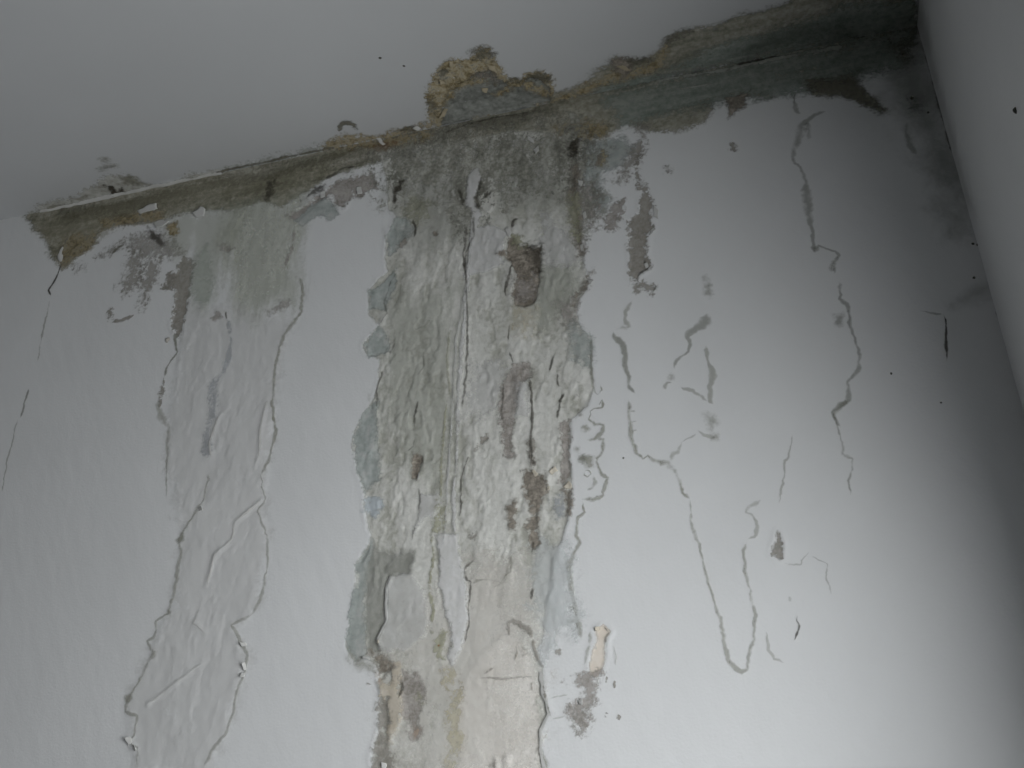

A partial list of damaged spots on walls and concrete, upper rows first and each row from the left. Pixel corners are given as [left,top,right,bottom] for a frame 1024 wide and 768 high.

peeling [287,46,598,768]
damp [24,0,919,407]
peeling [566,625,610,728]